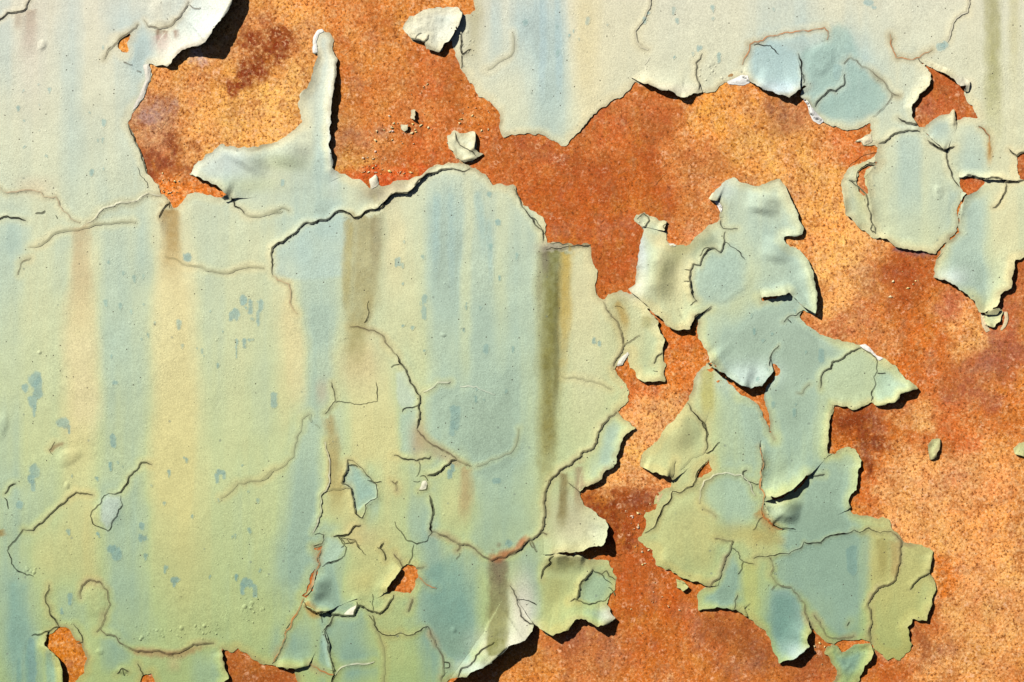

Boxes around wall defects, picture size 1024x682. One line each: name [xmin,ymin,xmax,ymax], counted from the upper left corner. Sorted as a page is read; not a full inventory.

rust [218,8,305,105]
peeling [191,29,346,200]
crack [271,132,476,314]
peeling [727,38,1024,332]
damp [102,240,227,506]
damp [269,294,310,419]
crack [221,301,640,682]
damp [416,550,488,643]
rust [447,308,837,682]
peeling [605,177,936,682]
crack [645,403,929,643]
rust [827,402,902,488]